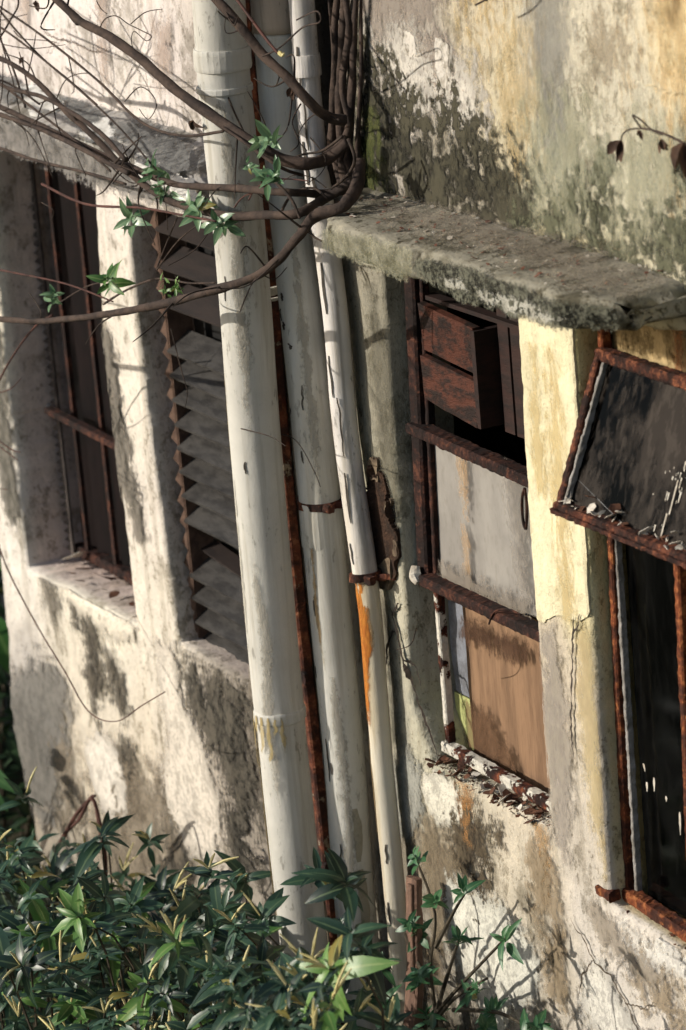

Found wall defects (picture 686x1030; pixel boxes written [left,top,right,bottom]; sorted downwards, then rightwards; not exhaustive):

water stain [346,15,553,234]
water stain [556,136,617,257]
water stain [440,277,468,292]
flaking render [366,457,402,590]
corrosion [456,456,470,576]
corrosion [311,549,321,643]
water stain [38,577,143,822]
corrosion [355,583,377,825]
crack [570,614,580,763]
corrosion [457,780,473,845]
water stain [414,795,507,1030]
crack [571,920,655,1030]